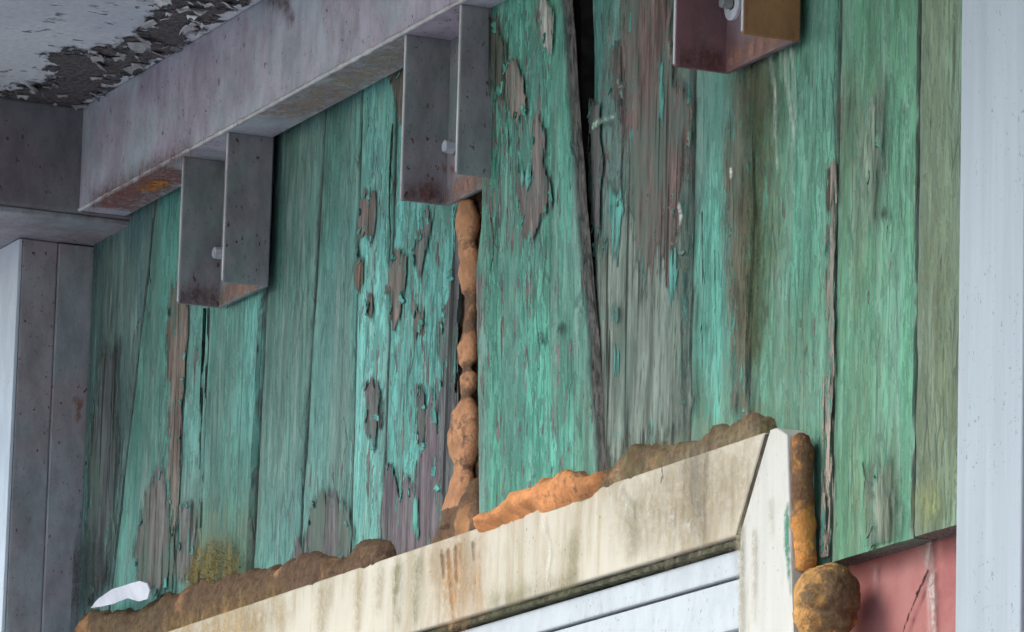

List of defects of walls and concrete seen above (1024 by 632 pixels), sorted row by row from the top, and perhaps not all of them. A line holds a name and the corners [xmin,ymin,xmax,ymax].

peeling [0,0,253,111]
peeling [539,0,554,57]
peeling [488,14,553,249]
corrosion [101,153,182,210]
peeling [354,187,378,321]
peeling [363,375,382,451]
peeling [377,204,460,555]
peeling [290,480,355,559]
damp [440,542,473,608]